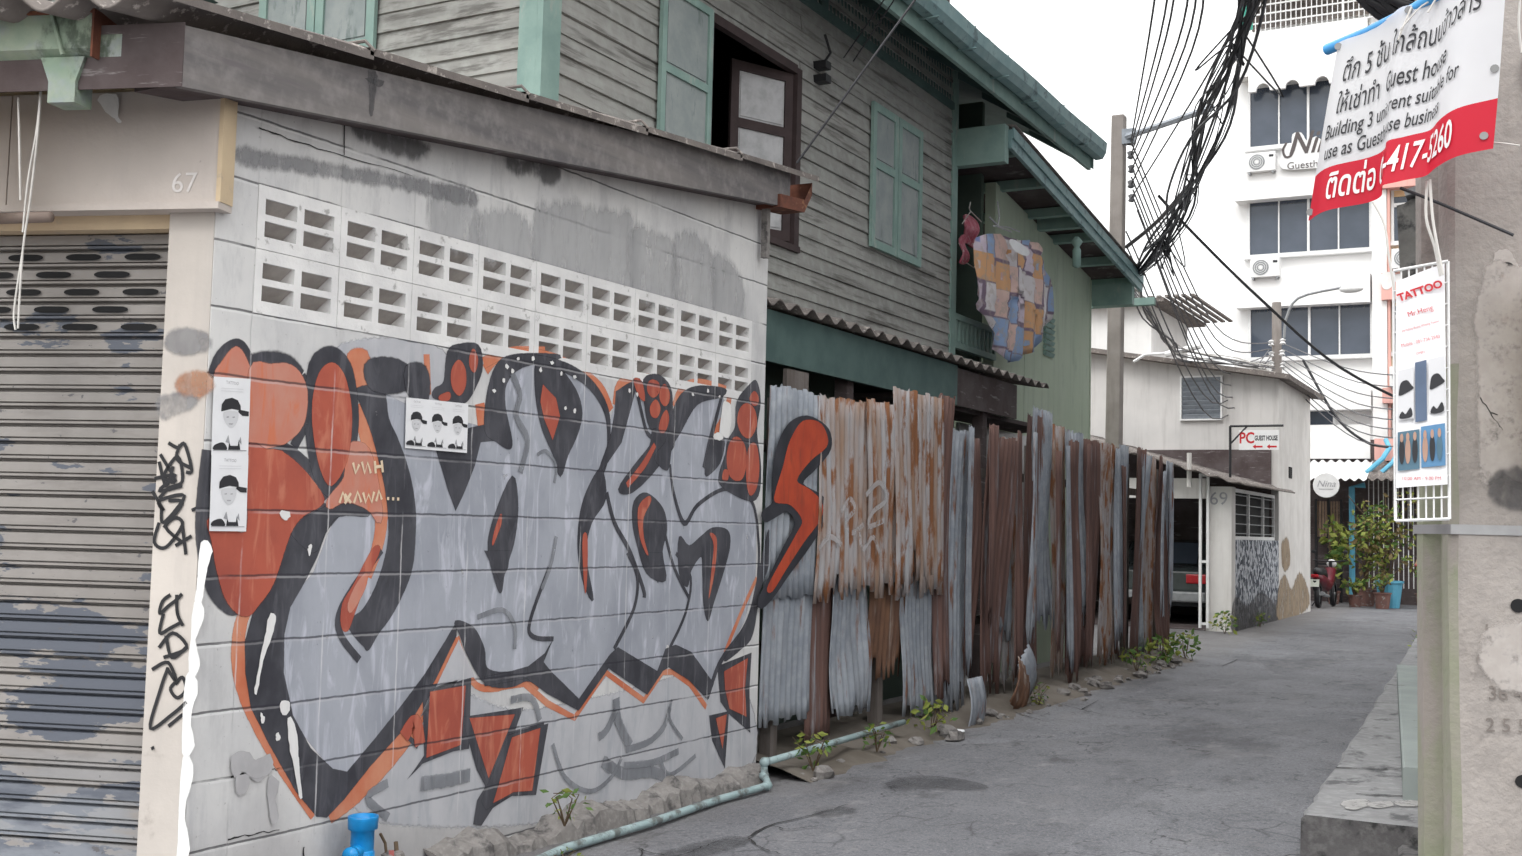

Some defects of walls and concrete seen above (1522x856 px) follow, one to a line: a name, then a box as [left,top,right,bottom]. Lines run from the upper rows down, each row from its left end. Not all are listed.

leakage [352,72,430,158]
leakage [235,147,744,318]